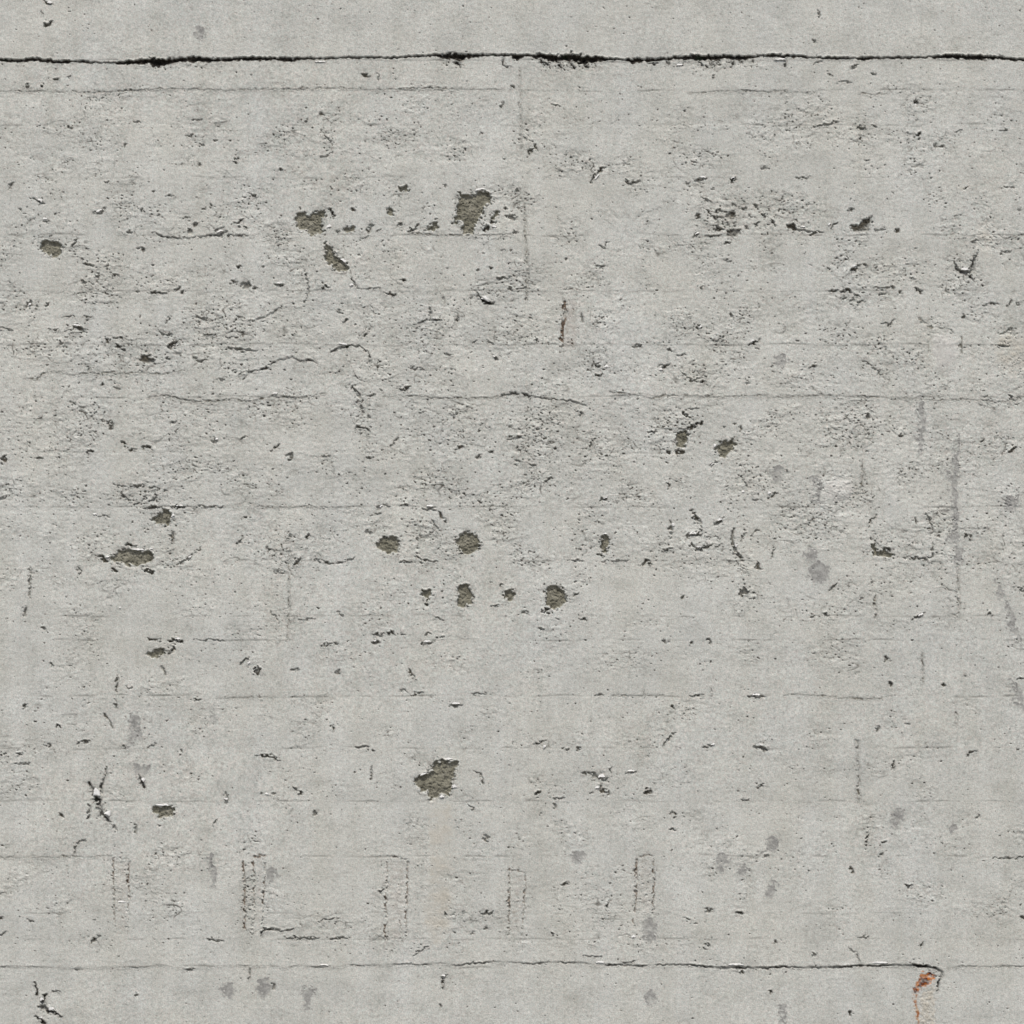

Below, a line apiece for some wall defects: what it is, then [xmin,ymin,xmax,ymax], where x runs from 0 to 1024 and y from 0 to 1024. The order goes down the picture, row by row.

crack [0,50,1024,148]
spalling [386,184,518,235]
spalling [294,208,379,272]
spalling [666,408,703,455]
spalling [113,483,186,545]
spalling [97,543,154,575]
spalling [365,529,438,564]
spalling [456,530,482,556]
spalling [521,585,579,615]
spalling [414,758,459,801]
crack [0,953,1024,1024]
corrosion [911,970,937,1024]